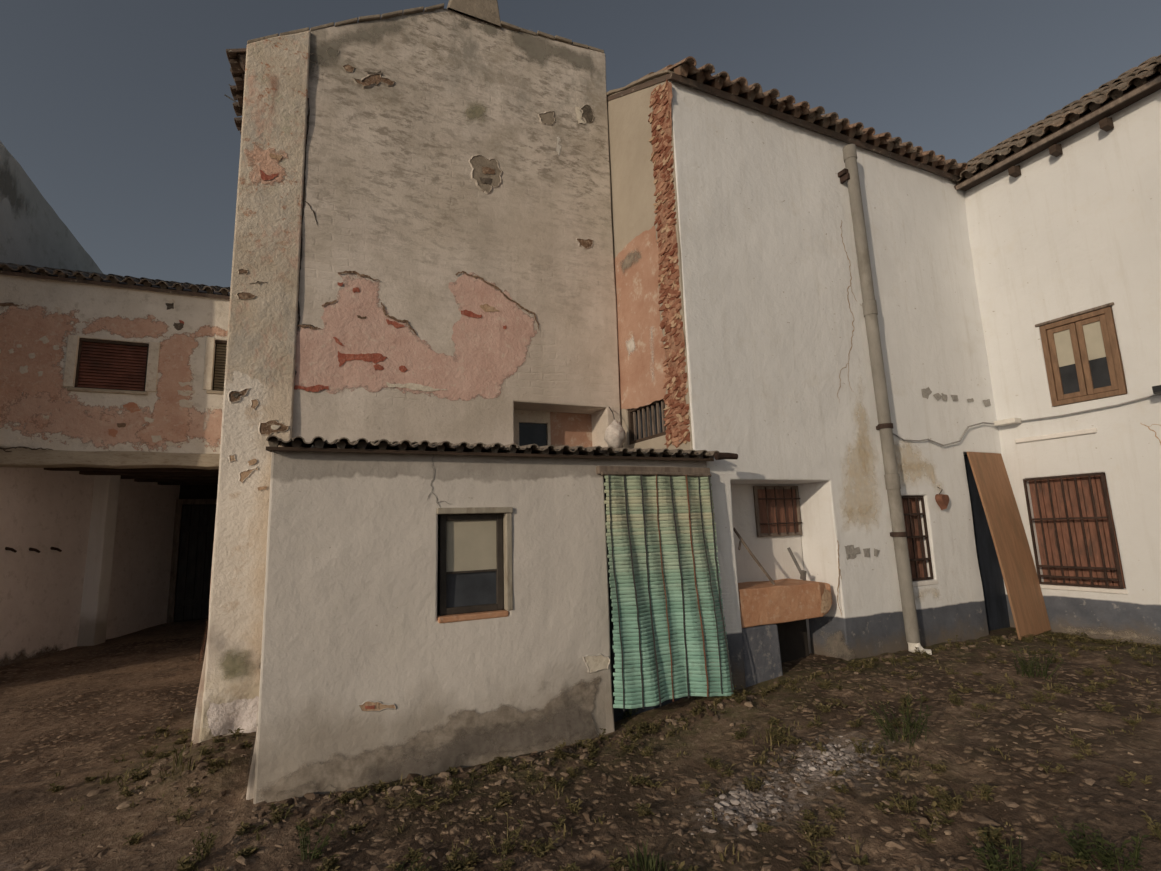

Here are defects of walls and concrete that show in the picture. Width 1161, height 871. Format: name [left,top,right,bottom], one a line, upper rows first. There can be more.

peeling [342,64,395,89]
peeling [244,142,288,193]
peeling [469,154,503,194]
crack [837,220,856,396]
peeling [294,271,539,401]
peeling [0,299,289,452]
crack [427,454,449,508]
water stain [221,652,248,679]
peeling [358,700,396,712]
water stain [259,678,600,803]